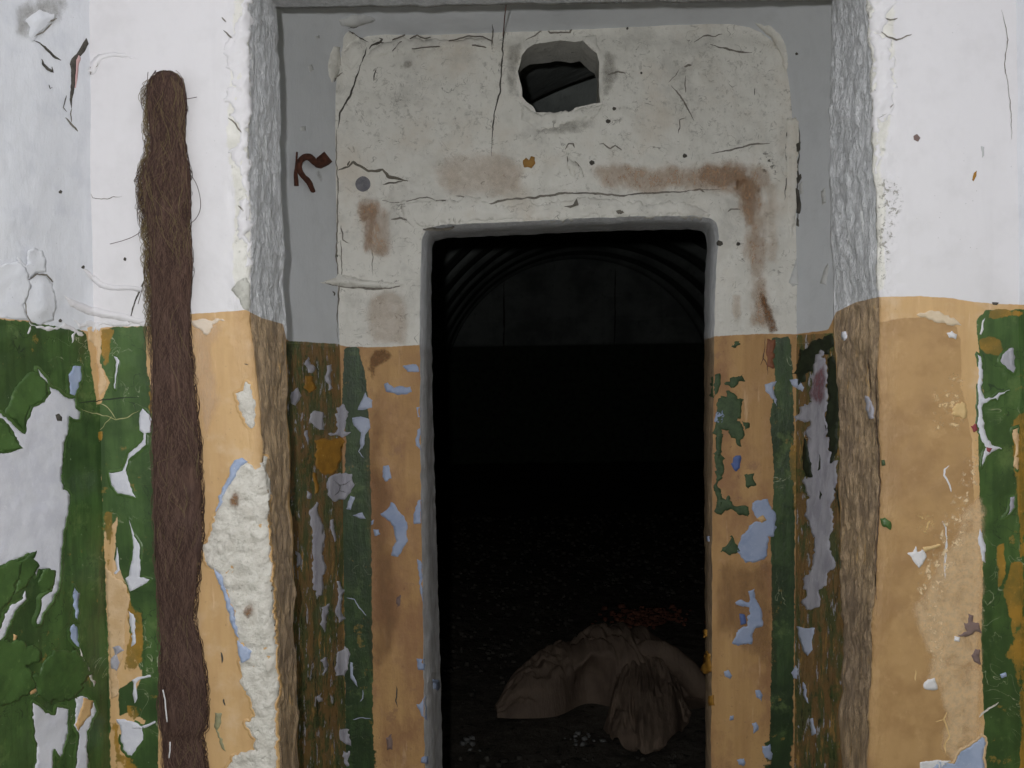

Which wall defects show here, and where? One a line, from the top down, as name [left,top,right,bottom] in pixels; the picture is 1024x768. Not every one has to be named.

crack [332,26,572,337]
crack [489,188,741,212]
corrosion [756,288,776,332]
peeling [0,363,99,768]
peeling [105,515,153,703]
peeling [106,407,153,500]
peeling [295,393,422,631]
peeling [709,373,777,563]
peeling [732,589,763,646]
peeling [790,331,847,610]
peeling [952,348,1020,472]
peeling [116,719,155,759]